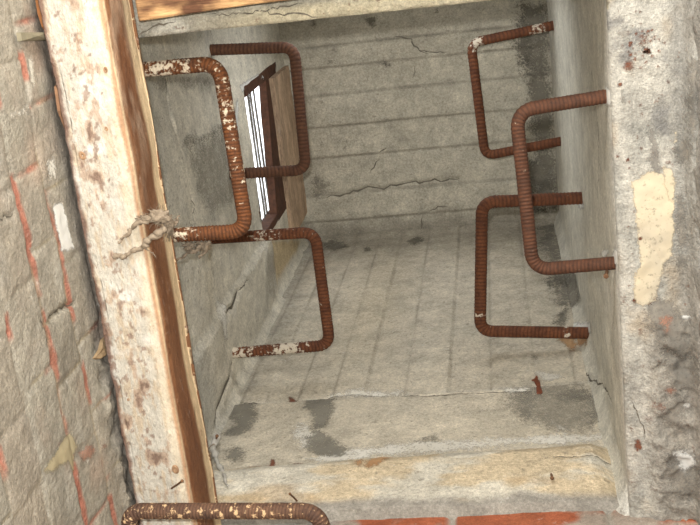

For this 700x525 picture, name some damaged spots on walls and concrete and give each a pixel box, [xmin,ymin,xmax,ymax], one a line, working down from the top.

crack [396,36,446,54]
damp [516,32,553,102]
rust [623,23,666,70]
crack [327,148,460,198]
damp [527,113,558,194]
crack [226,279,249,313]
peeling [631,129,700,428]
damp [223,403,258,435]
damp [224,447,244,464]
spalling [659,445,700,496]